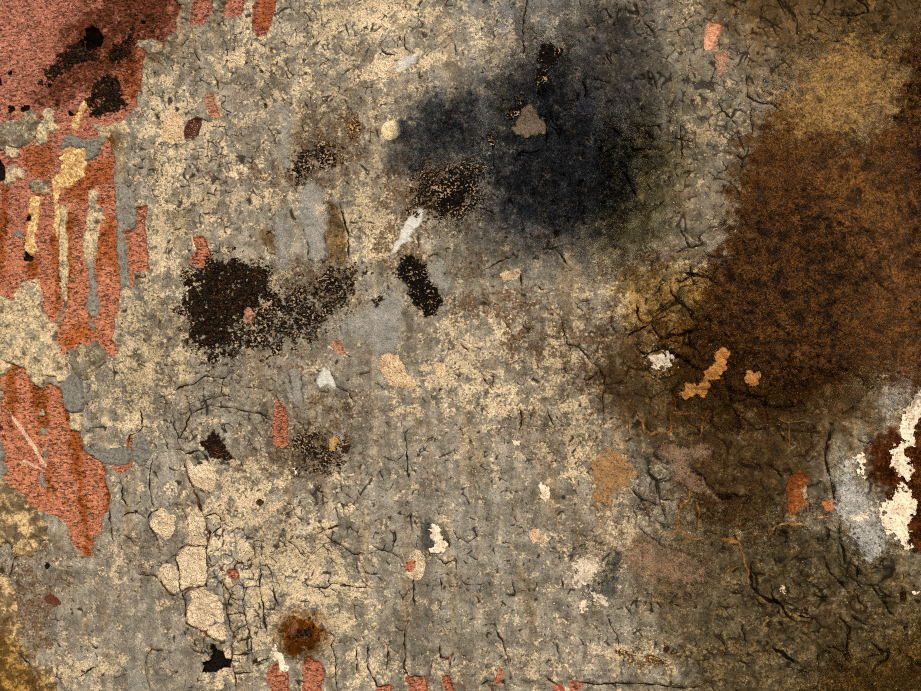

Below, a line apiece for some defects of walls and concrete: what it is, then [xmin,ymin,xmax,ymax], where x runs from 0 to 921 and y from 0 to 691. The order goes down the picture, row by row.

spalling [223,0,278,37]
spalling [0,0,220,357]
corrosion [679,23,921,400]
peeling [243,306,255,325]
crack [627,229,738,371]
spalling [0,364,153,556]
crack [108,372,279,691]
spalling [186,459,229,503]
crack [773,429,921,672]
corrosion [865,417,921,552]
corrosion [279,613,327,658]
crack [578,681,699,689]